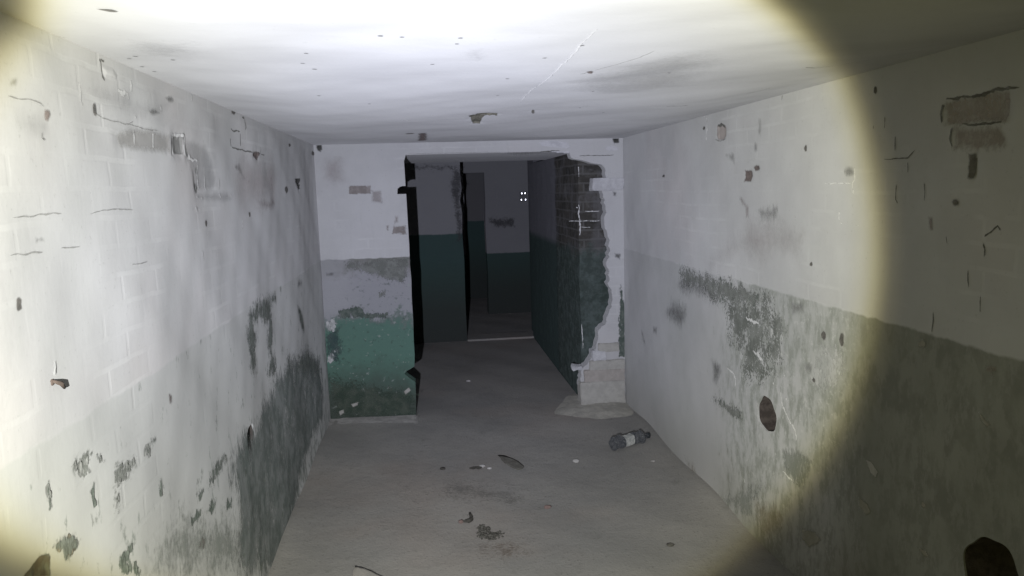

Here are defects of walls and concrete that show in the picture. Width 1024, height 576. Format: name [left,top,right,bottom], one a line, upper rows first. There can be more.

spalling [469,113,497,124]
flaking render [940,86,1019,146]
flaking render [118,133,205,192]
spalling [589,178,624,191]
spalling [968,154,977,178]
peeling [679,267,787,431]
peeling [71,451,102,508]
peeling [114,439,156,505]
spalling [25,533,78,576]
peeling [119,543,141,576]
spalling [965,537,1018,576]